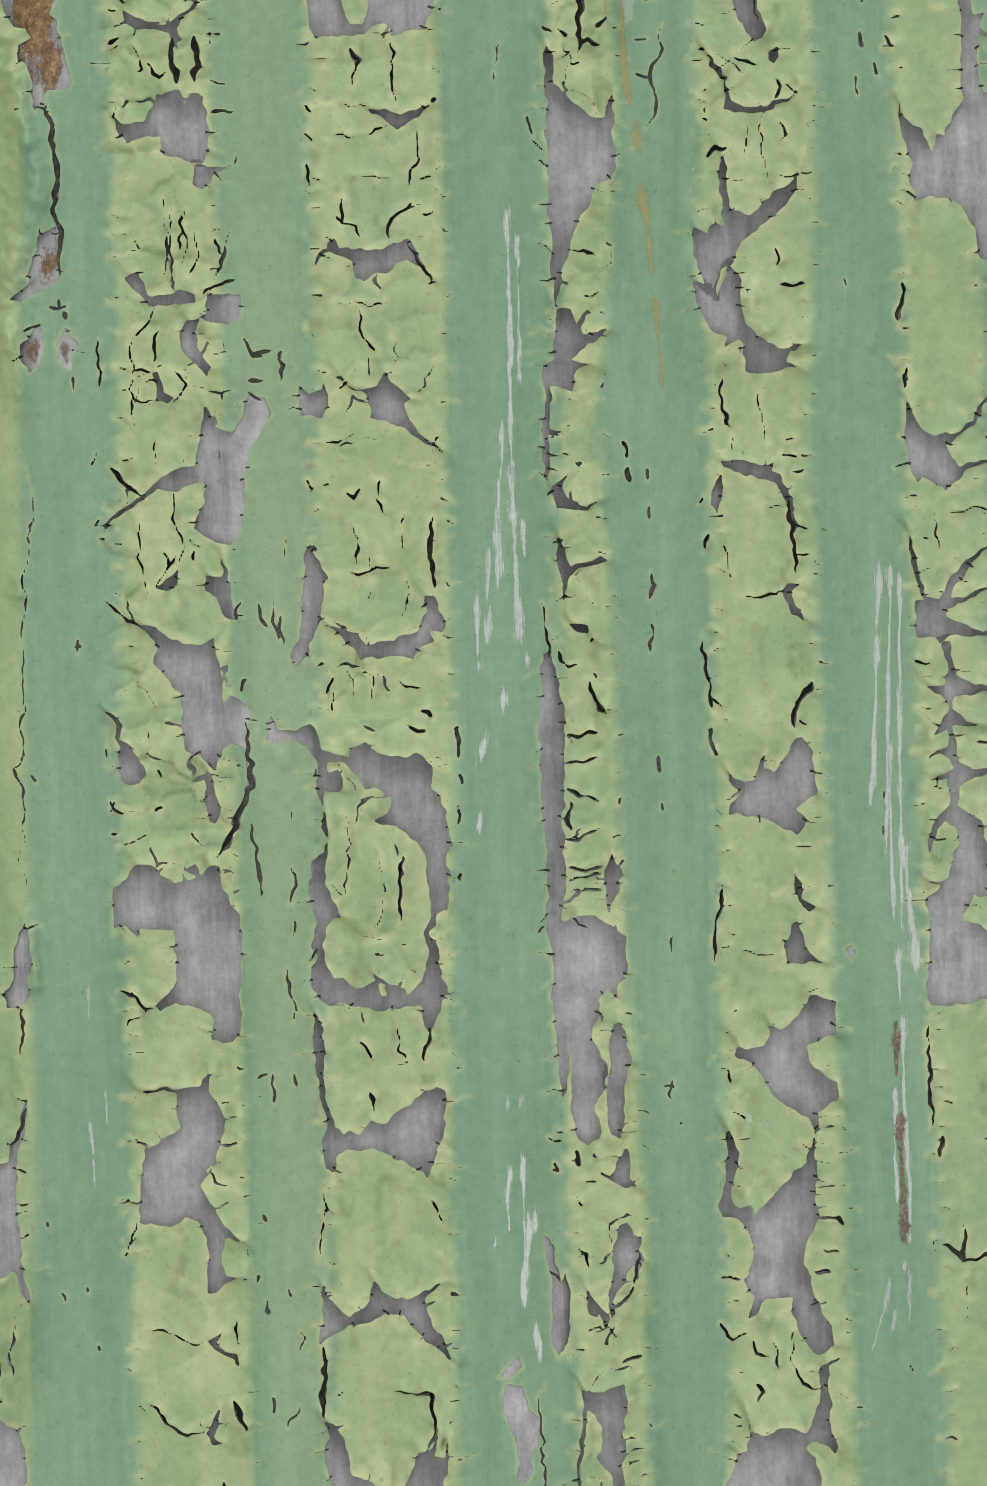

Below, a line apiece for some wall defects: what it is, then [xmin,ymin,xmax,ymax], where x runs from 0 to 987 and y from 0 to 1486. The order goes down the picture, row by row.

rust [11,0,64,94]
crack [349,48,360,85]
crack [304,105,433,237]
crack [339,301,382,375]
peeling [672,0,827,636]
crack [306,480,436,604]
peeling [0,0,470,1380]
peeling [298,22,659,1486]
peeling [887,379,987,1029]
peeling [697,716,862,1486]
rust [892,1021,901,1077]
rust [894,1112,912,1243]